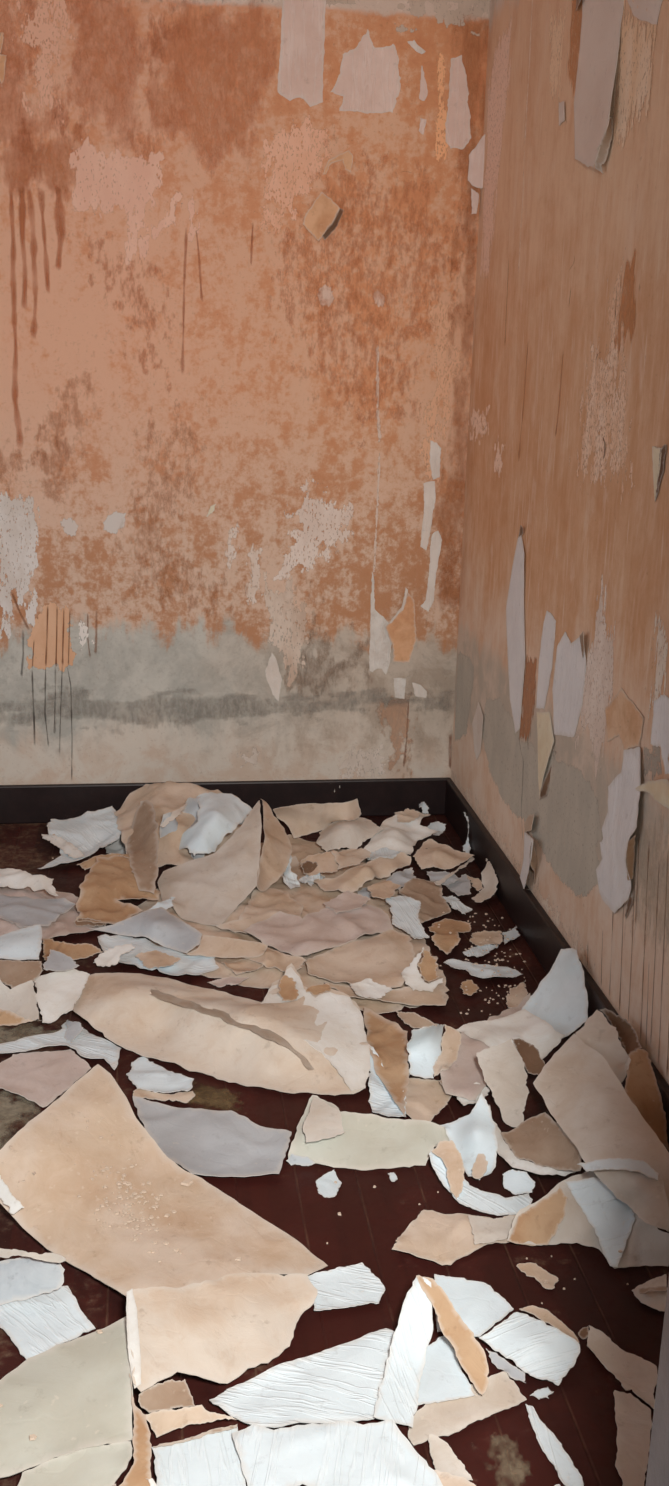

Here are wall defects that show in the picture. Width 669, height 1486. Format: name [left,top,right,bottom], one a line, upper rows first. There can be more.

water stain [0,13,72,365]
flaking render [394,0,490,162]